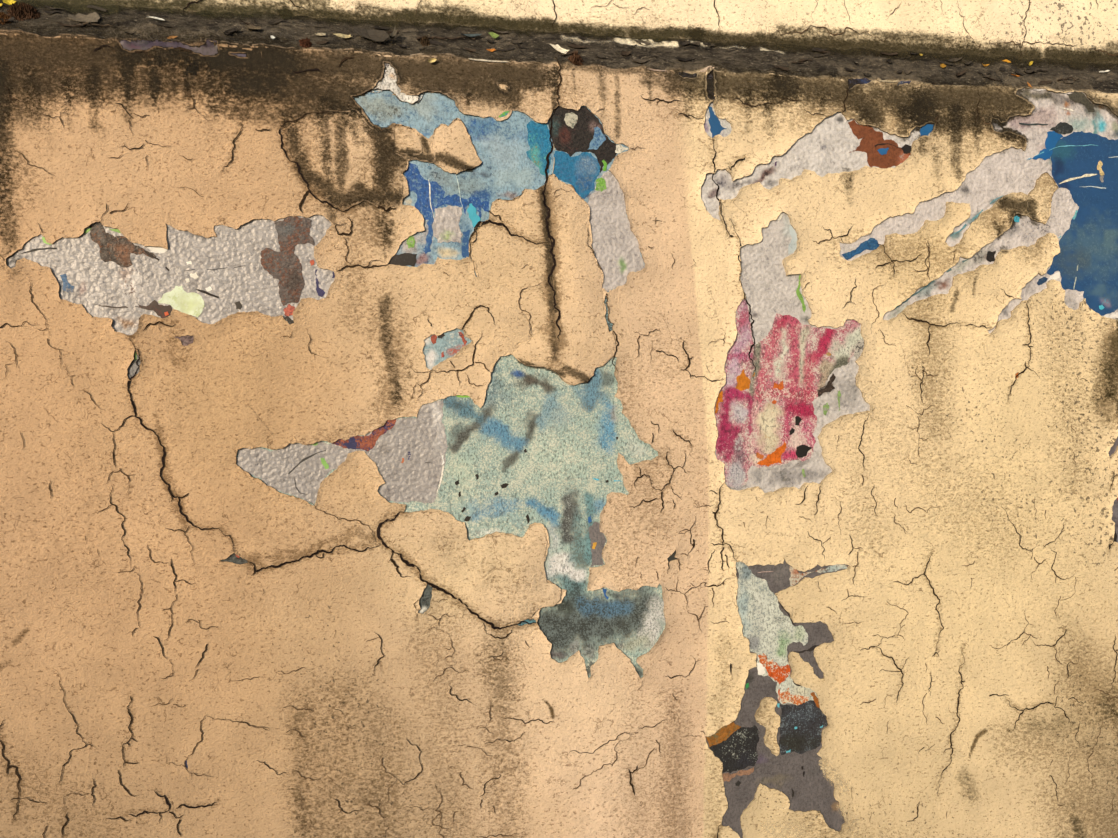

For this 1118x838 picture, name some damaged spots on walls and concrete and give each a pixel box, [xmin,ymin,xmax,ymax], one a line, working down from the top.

peeling [0,202,349,394]
crack [0,281,553,838]
peeling [236,26,690,692]
crack [569,421,768,796]
peeling [693,545,860,838]
peeling [647,59,1118,505]
crack [836,414,941,534]
crack [812,225,989,464]
crack [795,486,1118,835]
crack [1000,288,1038,397]
peeling [1096,406,1118,556]